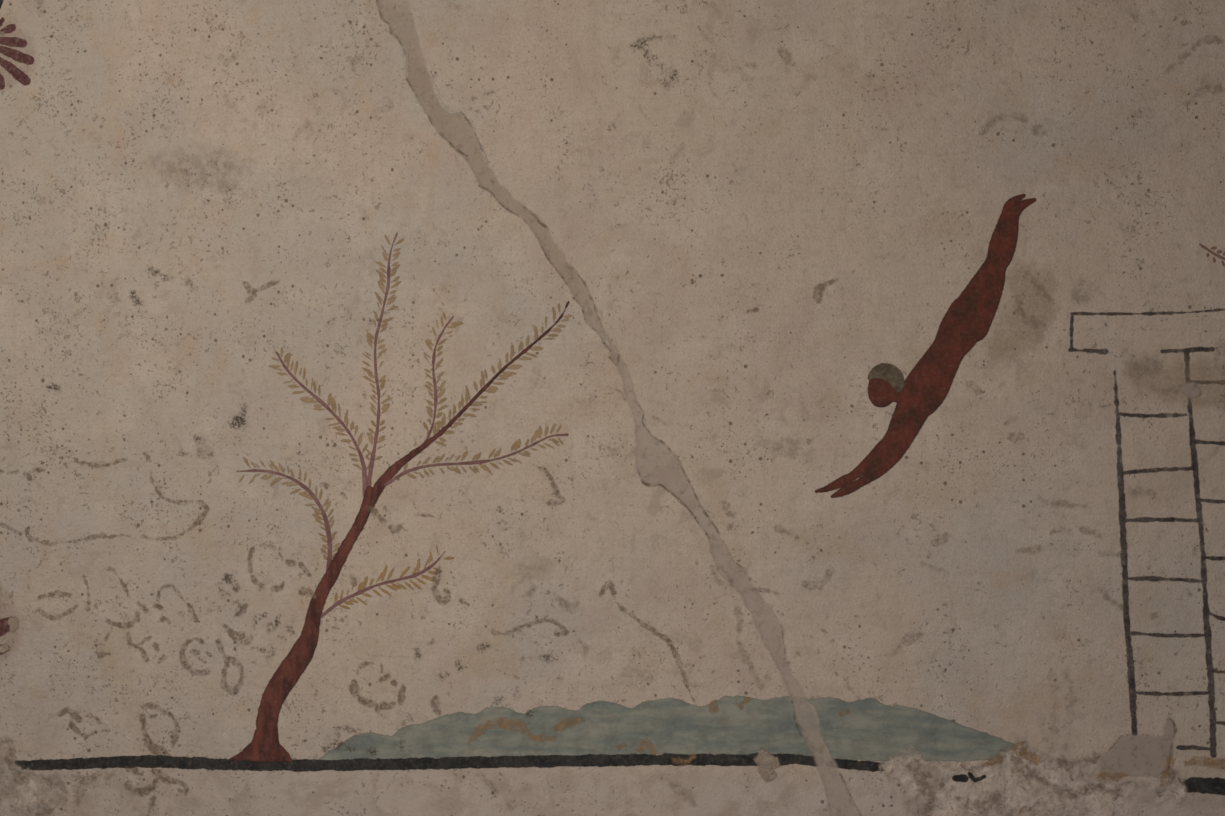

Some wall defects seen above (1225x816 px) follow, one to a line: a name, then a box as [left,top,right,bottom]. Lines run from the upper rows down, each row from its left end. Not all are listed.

crack [402,46,859,816]
spalling [879,742,1186,816]